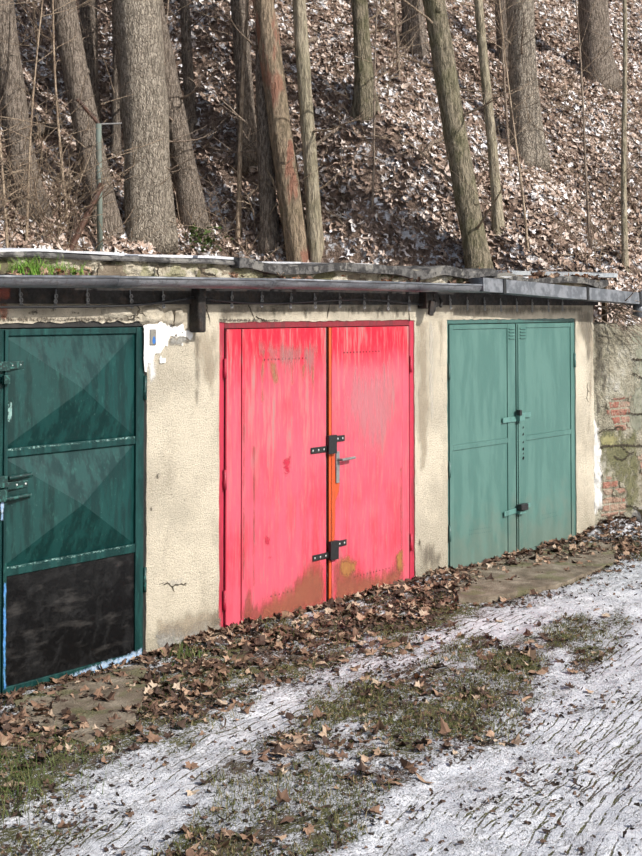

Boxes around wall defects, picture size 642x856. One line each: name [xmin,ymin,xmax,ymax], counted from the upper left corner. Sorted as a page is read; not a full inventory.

peeling [0,308,193,380]
peeling [606,396,632,431]
crack [599,412,642,461]
peeling [594,419,627,517]
corrosion [245,570,322,620]
corrosion [336,552,403,599]